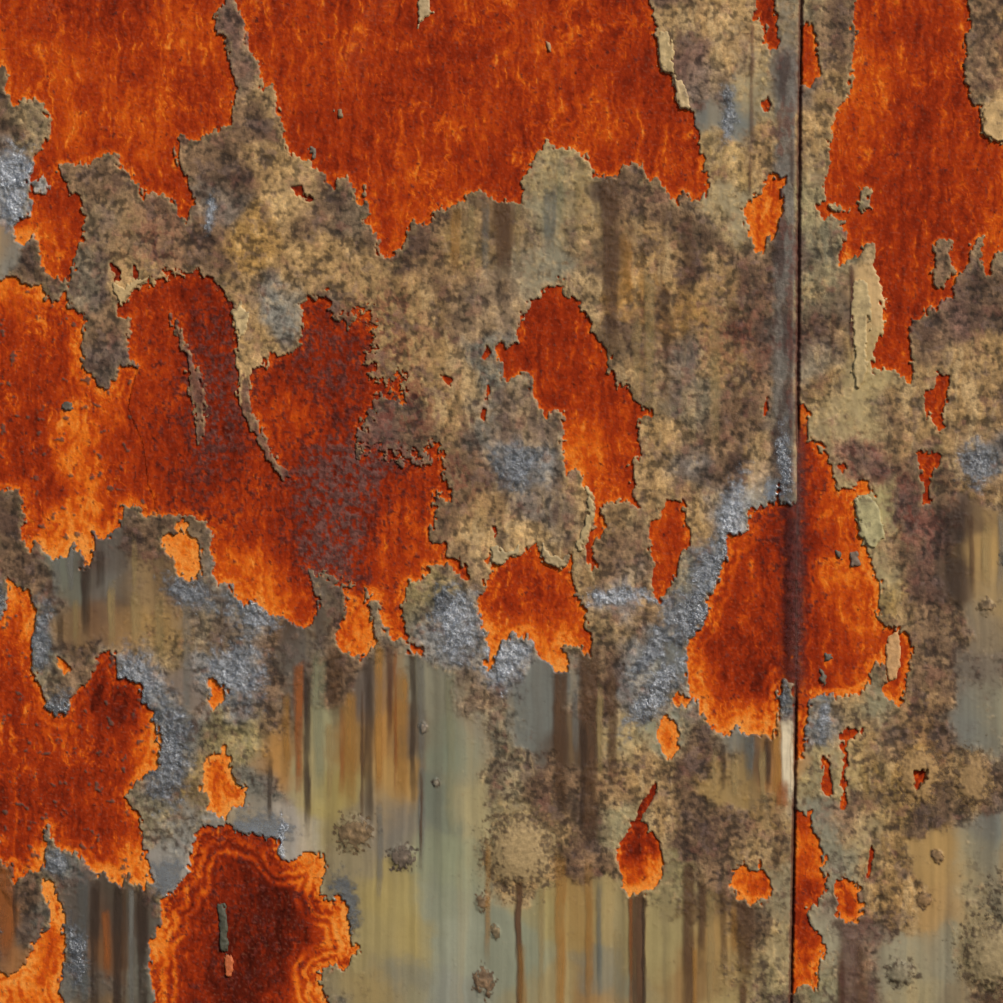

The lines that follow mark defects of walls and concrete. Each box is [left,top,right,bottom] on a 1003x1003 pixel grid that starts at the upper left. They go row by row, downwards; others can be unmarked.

peeling [655,28,690,111]
rust [815,0,1003,384]
peeling [230,300,249,342]
rust [0,0,710,672]
peeling [542,486,596,568]
peeling [592,471,750,724]
rust [0,578,162,1003]
leakage [285,650,415,811]
leakage [749,721,793,804]
rust [148,745,361,1003]
leakage [515,883,523,1003]
leakage [629,894,645,1003]